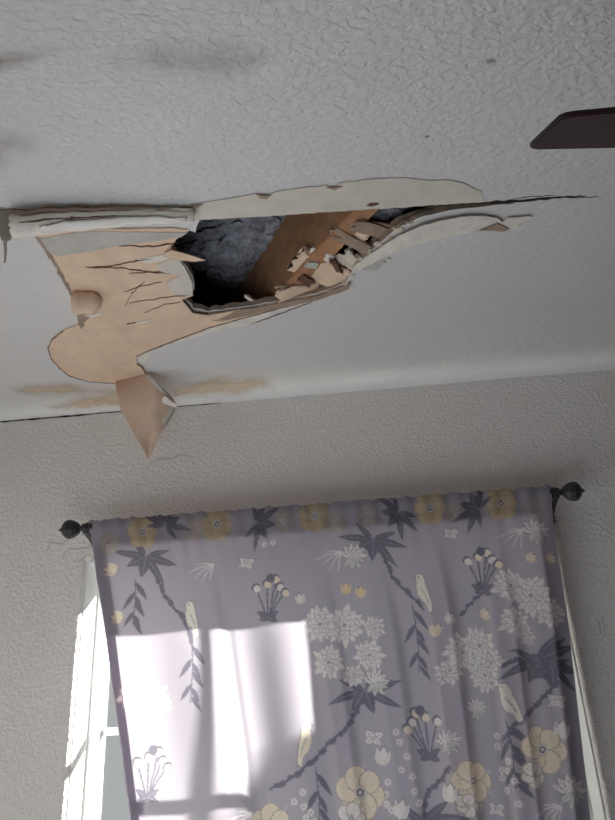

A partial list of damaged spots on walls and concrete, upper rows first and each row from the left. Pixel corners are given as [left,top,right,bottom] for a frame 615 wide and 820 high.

peeling [177,177,484,220]
peeling [353,215,534,271]
peeling [137,302,312,363]